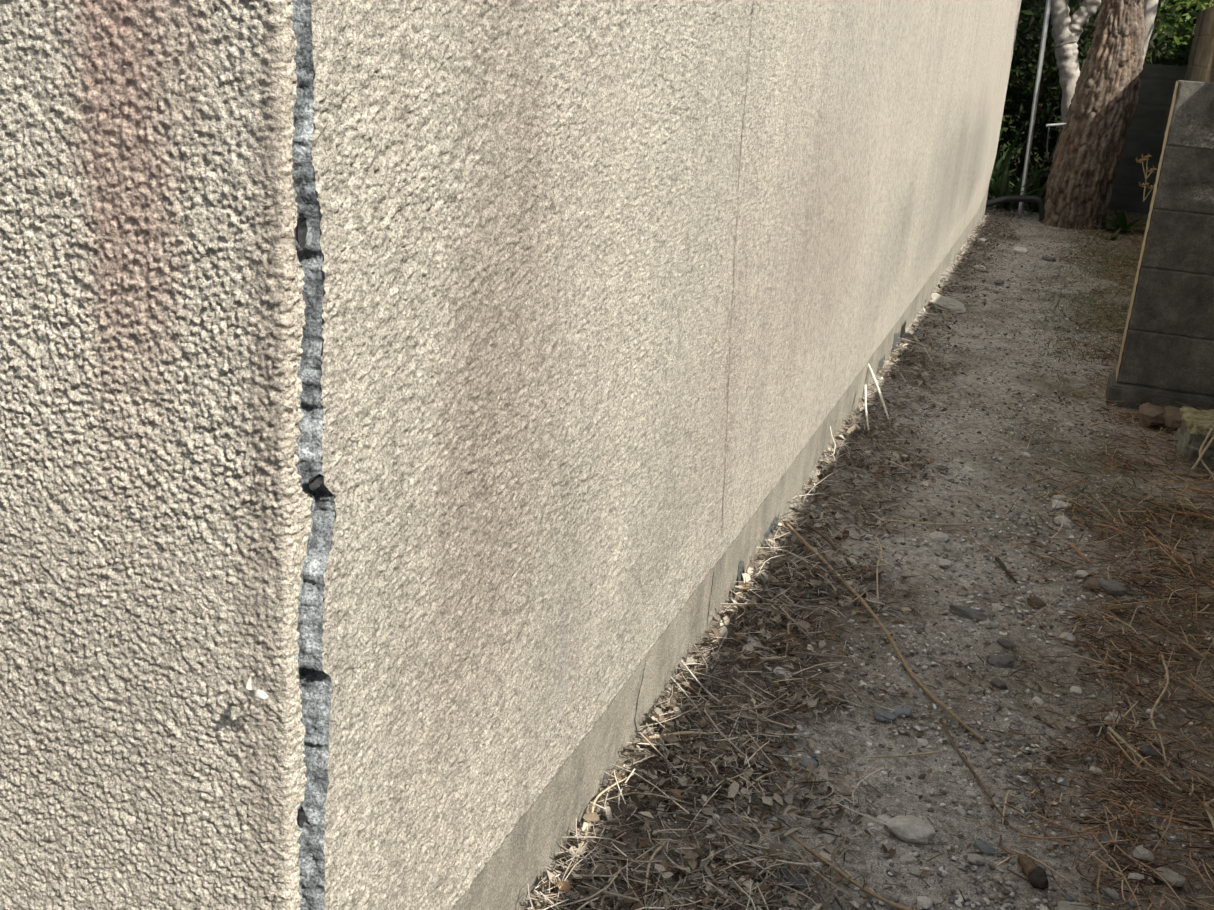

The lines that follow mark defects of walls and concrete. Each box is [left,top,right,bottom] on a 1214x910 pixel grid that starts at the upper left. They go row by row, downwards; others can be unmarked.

crack [292,0,335,910]